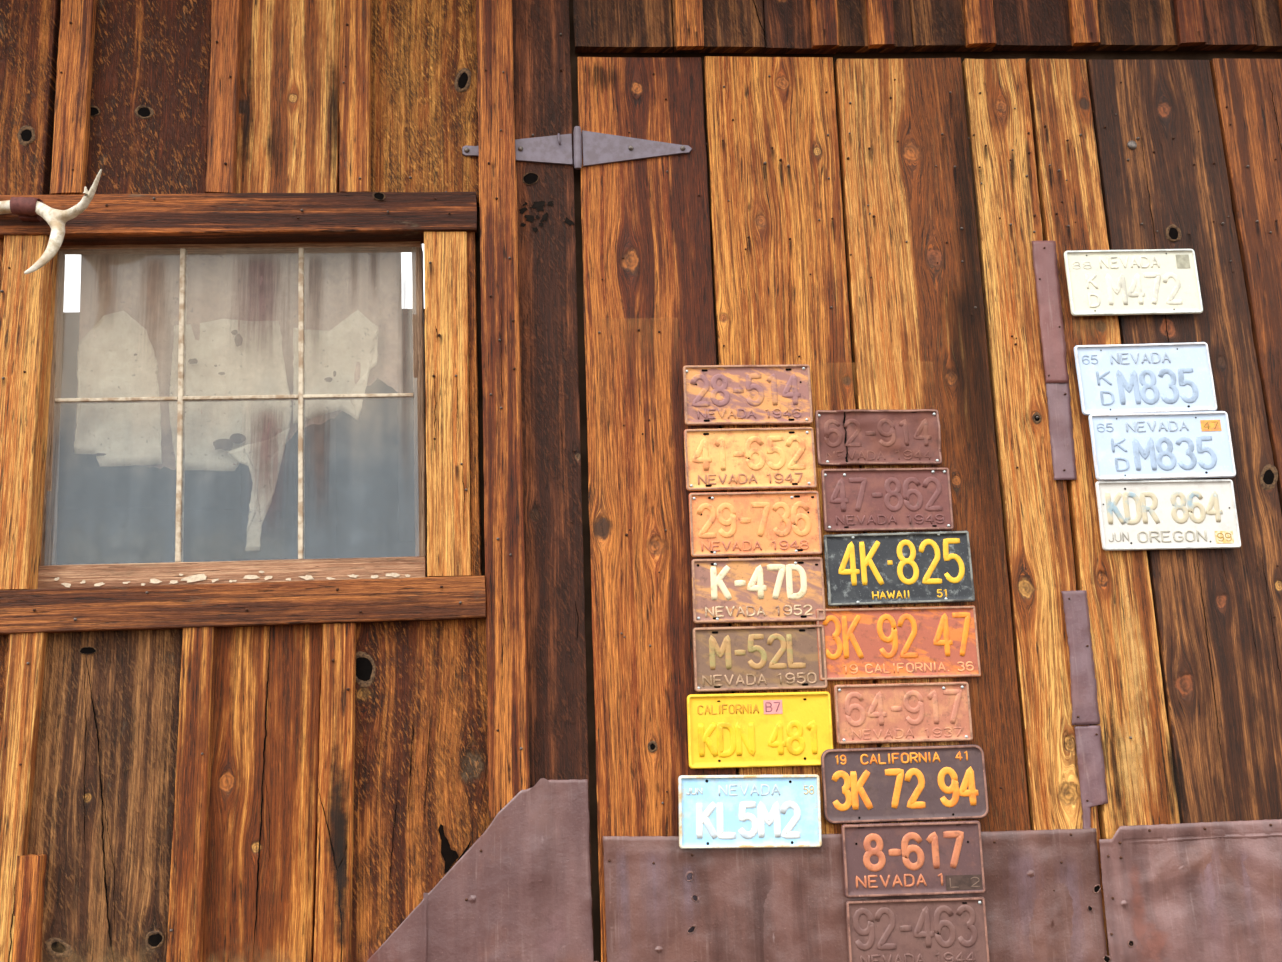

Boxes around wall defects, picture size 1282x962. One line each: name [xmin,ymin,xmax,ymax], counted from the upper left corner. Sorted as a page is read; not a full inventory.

peeling [123,571,410,586]
crack [83,657,115,962]